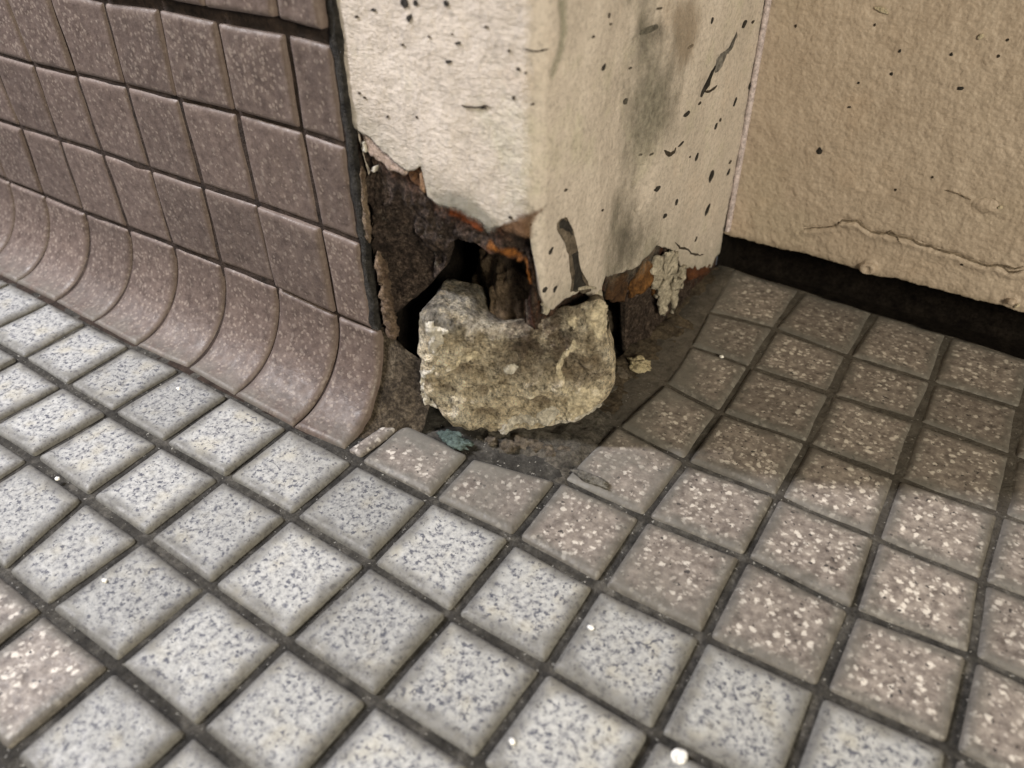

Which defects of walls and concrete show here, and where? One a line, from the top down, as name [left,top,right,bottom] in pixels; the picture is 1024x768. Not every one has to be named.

leakage [632,13,672,147]
corrosion [436,193,542,283]
spalling [359,133,716,354]
corrosion [604,260,656,303]
corrosion [686,264,711,280]
crack [804,219,1024,273]